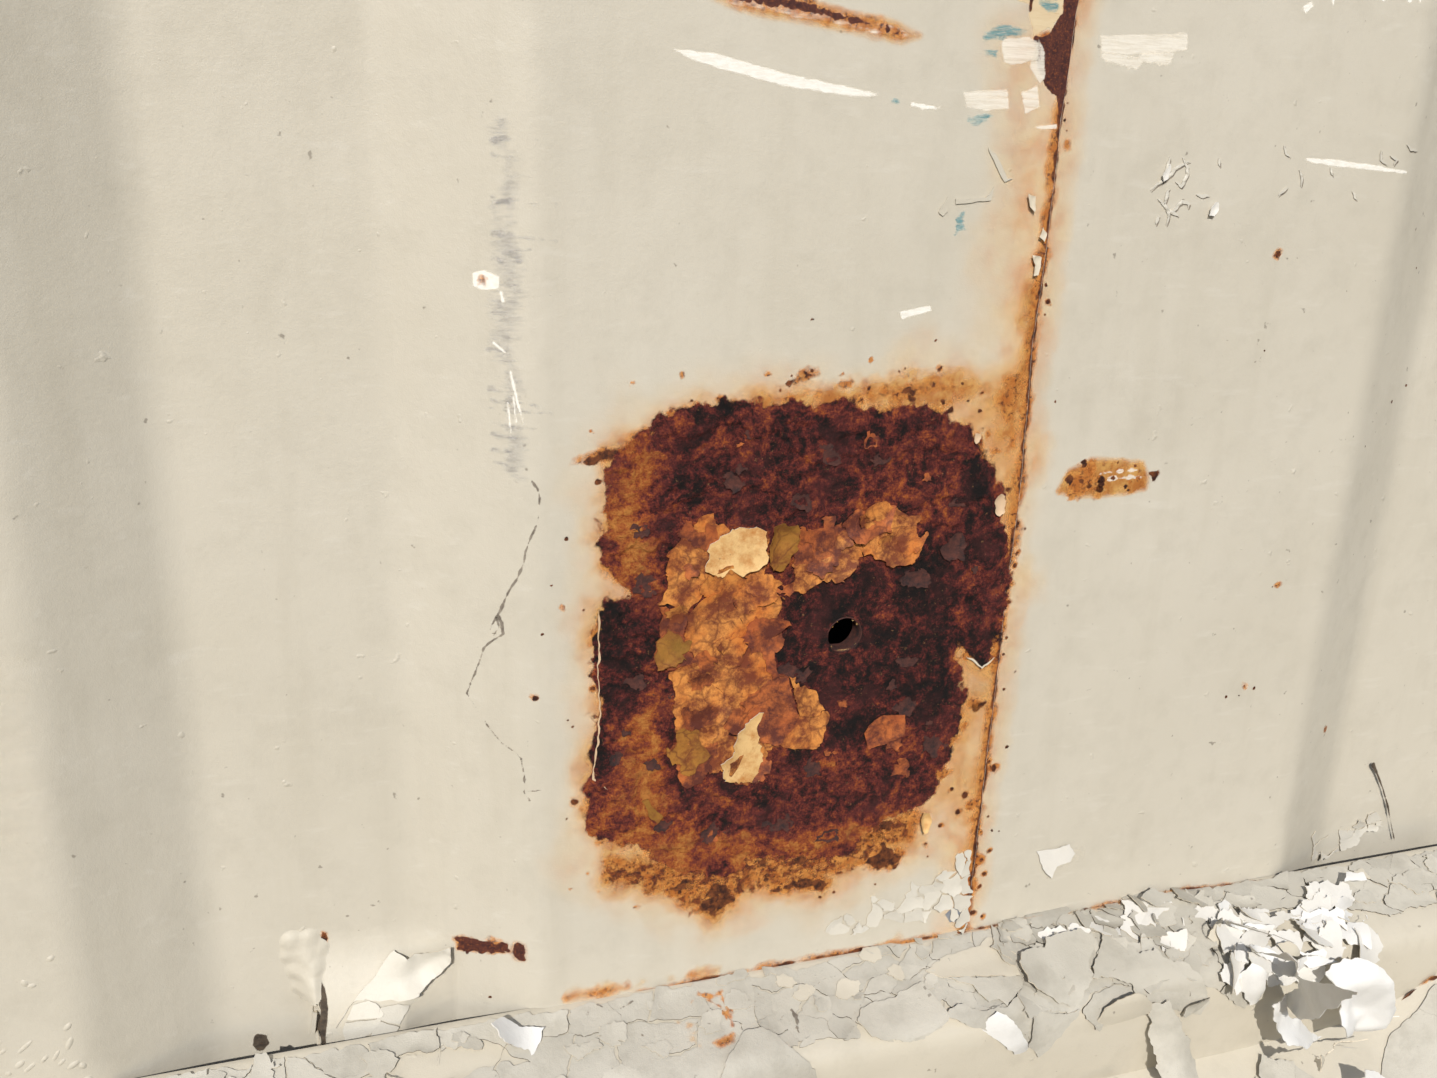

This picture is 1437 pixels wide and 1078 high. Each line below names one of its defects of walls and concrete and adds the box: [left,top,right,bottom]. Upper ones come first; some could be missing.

peeling [1019,0,1064,36]
rust [566,0,1091,934]
rust [1057,458,1160,501]
crack [466,481,541,801]
rust [1164,880,1257,893]
rust [453,936,526,961]
peeling [166,811,1437,1078]
rust [668,934,938,1048]